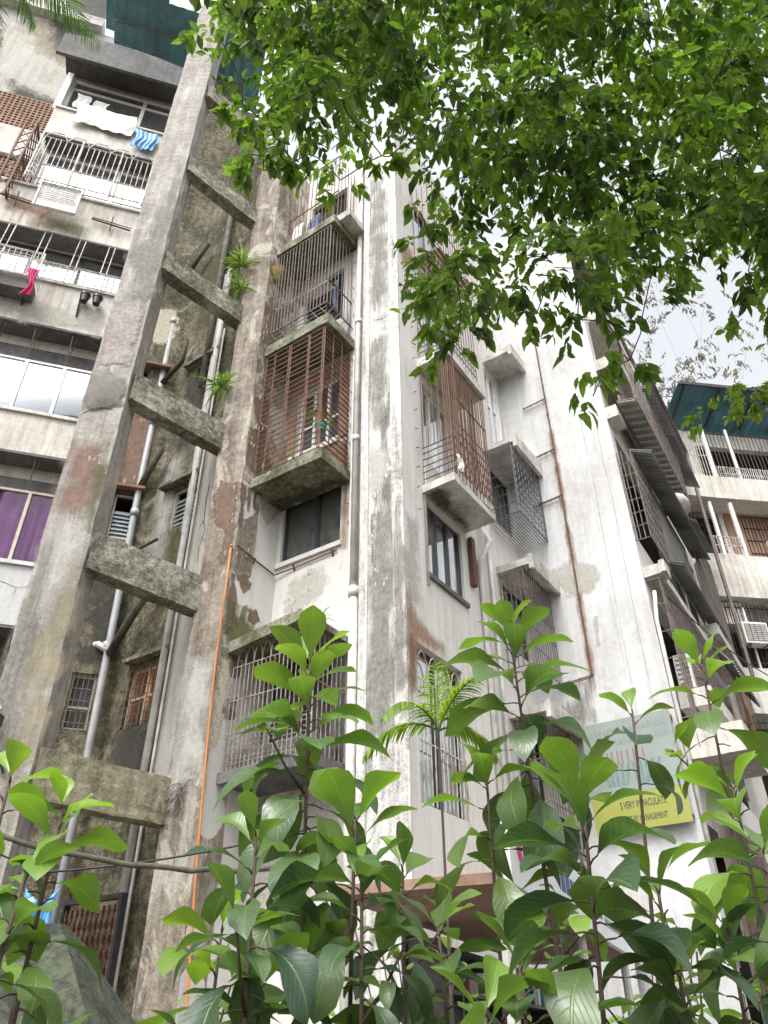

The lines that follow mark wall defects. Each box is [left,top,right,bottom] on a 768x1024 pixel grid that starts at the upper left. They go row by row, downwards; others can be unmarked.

damp [202,238,237,296]
damp [370,181,388,305]
damp [185,367,216,410]
damp [369,338,389,451]
damp [134,438,187,558]
corrosion [550,434,575,563]
damp [76,580,125,663]
peeling [213,481,260,635]
damp [367,466,419,735]
corrosion [407,595,444,691]
corrosion [578,593,594,674]